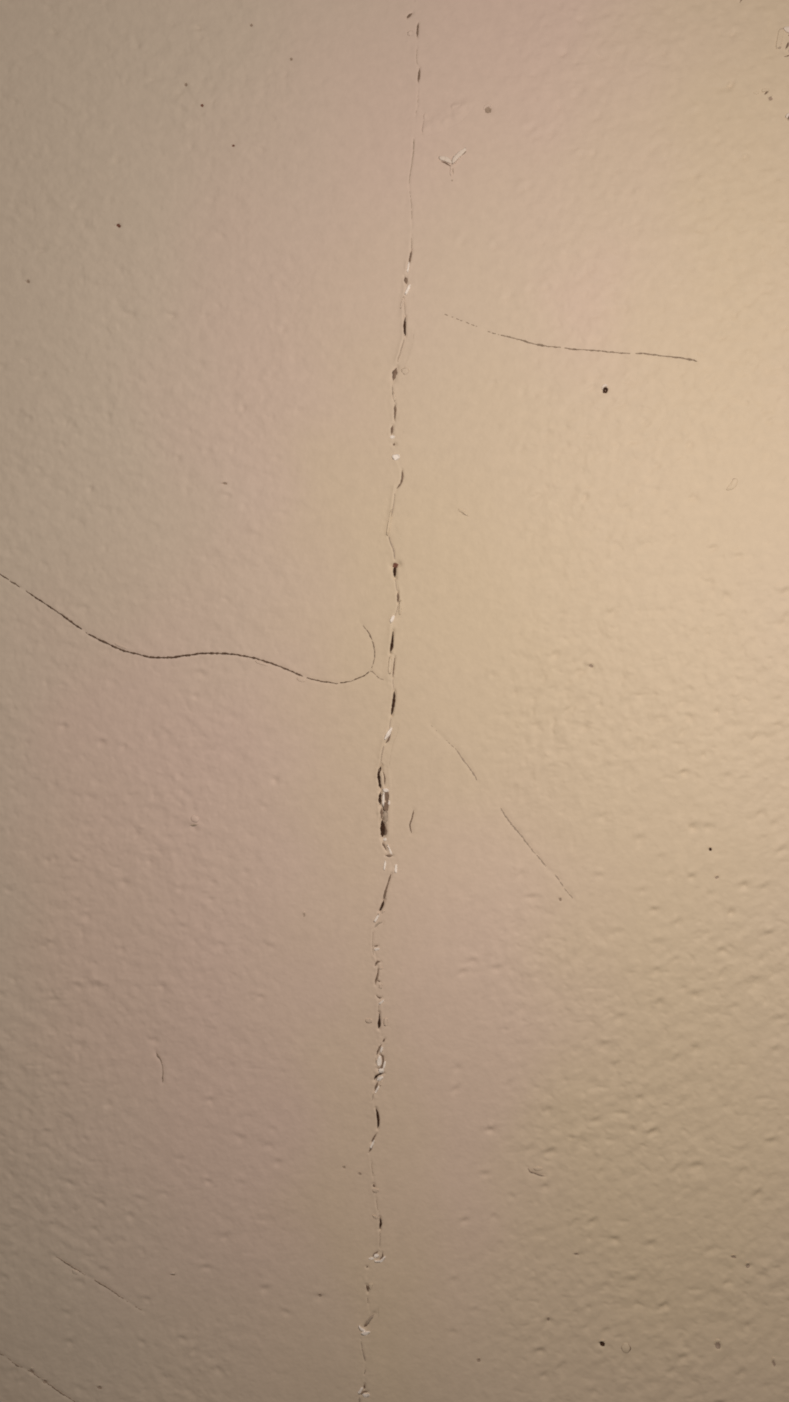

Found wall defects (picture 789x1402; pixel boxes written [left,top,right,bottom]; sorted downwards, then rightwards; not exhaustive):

crack [0,0,429,1402]
crack [445,314,697,362]